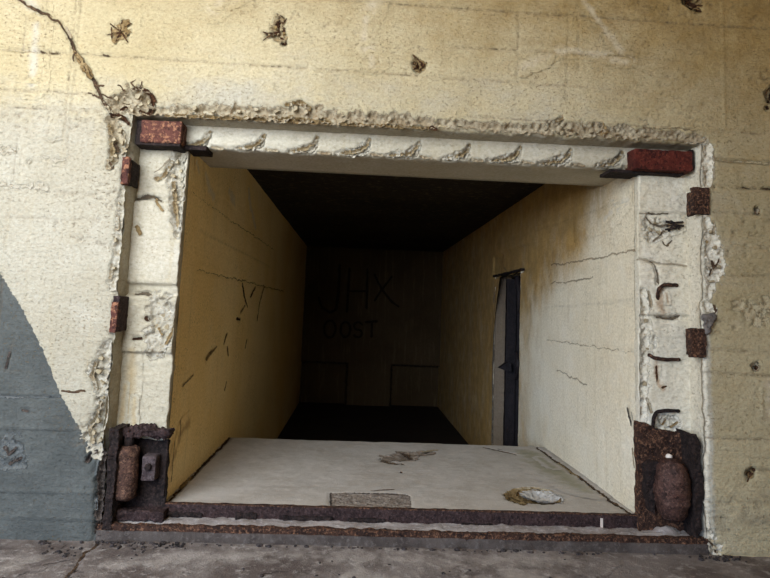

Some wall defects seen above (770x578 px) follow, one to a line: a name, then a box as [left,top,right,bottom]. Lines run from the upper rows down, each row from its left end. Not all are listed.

crack [19,0,111,111]
crack [108,23,132,43]
spalling [266,15,287,45]
spalling [106,189,125,291]
spalling [154,131,224,239]
spalling [102,79,715,188]
spalling [639,212,687,247]
spalling [701,216,726,335]
spalling [627,287,682,432]